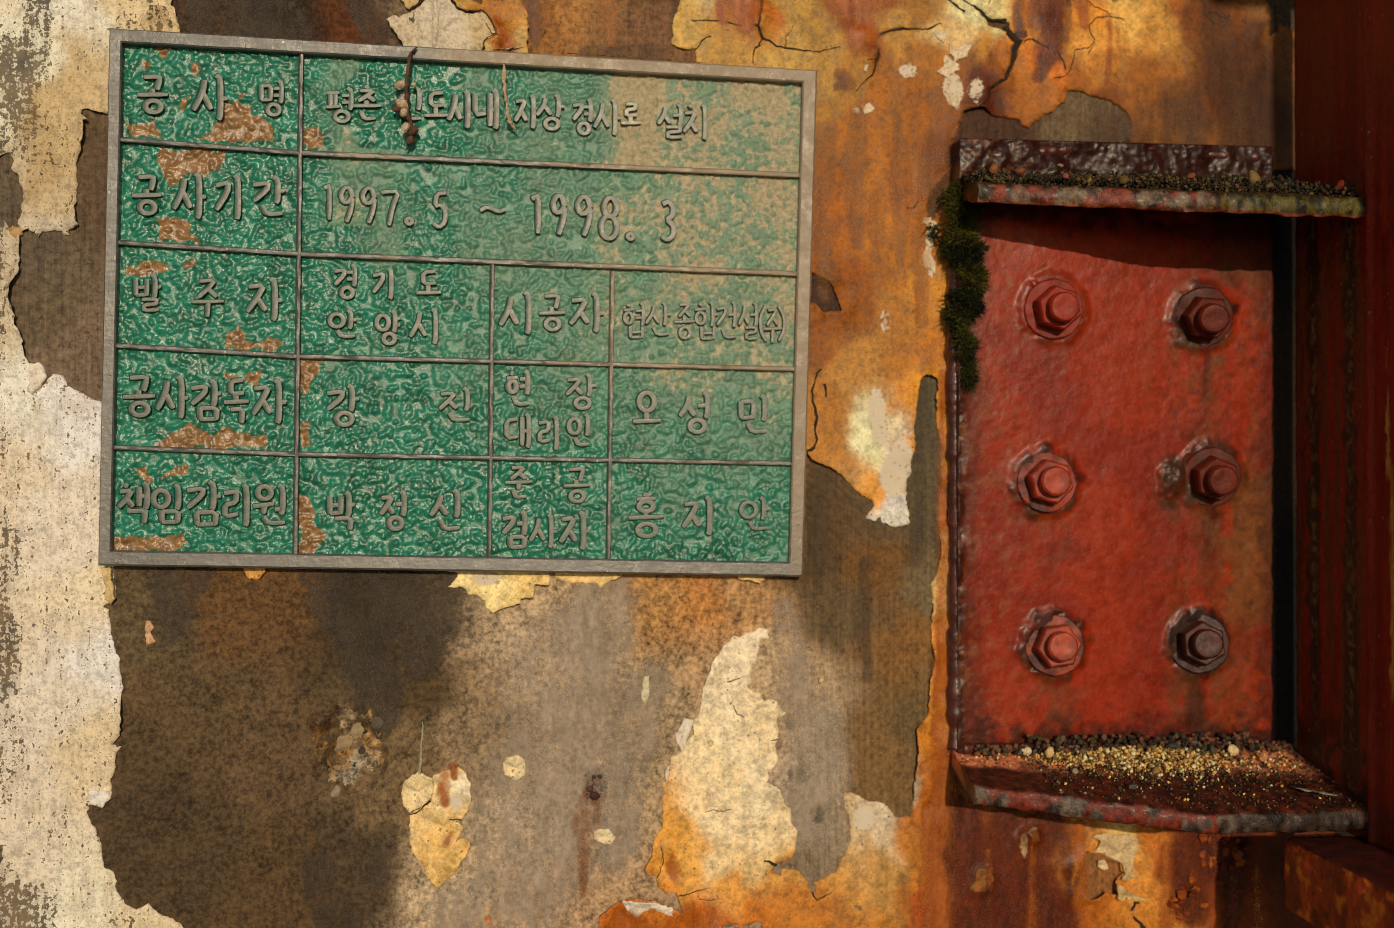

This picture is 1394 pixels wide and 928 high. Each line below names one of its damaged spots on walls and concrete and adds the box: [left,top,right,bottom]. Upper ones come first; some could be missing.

crack [691,0,1123,105]
corrosion [1013,0,1089,82]
peeling [671,0,1295,527]
peeling [0,0,183,928]
leakage [296,569,471,739]
peeling [401,767,471,887]
leakage [427,575,670,928]
corrosion [607,903,717,928]
leakage [773,596,848,845]
peeling [598,532,1335,928]
corrosion [920,369,1087,928]
corrosion [1160,830,1261,928]